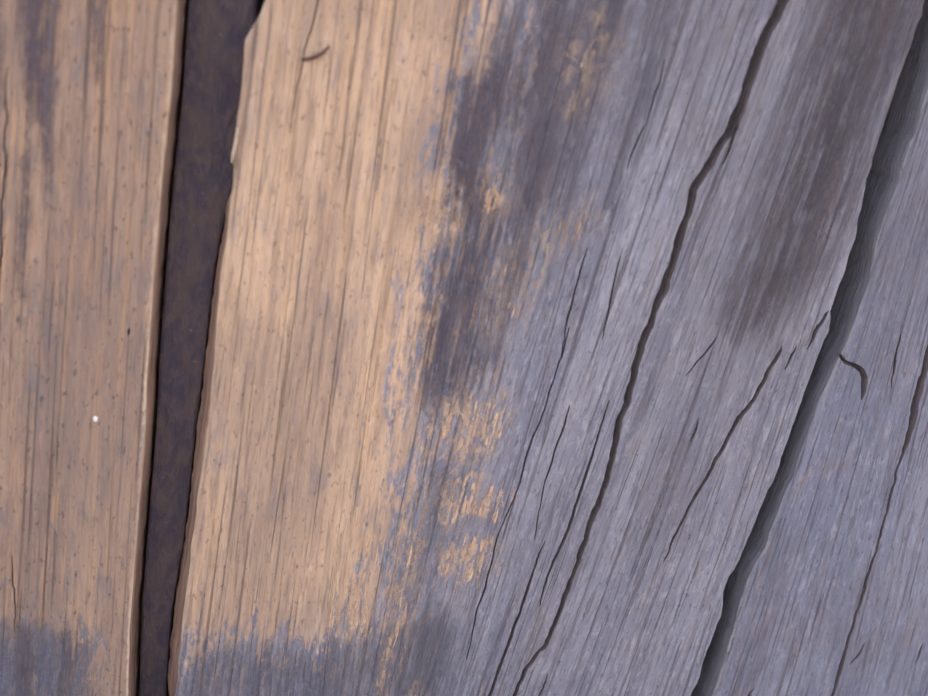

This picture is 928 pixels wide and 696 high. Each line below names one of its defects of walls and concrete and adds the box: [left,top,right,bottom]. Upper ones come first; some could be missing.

crack [290,0,319,133]
crack [466,0,790,696]
crack [663,310,829,562]
crack [831,345,928,696]
crack [891,333,901,388]